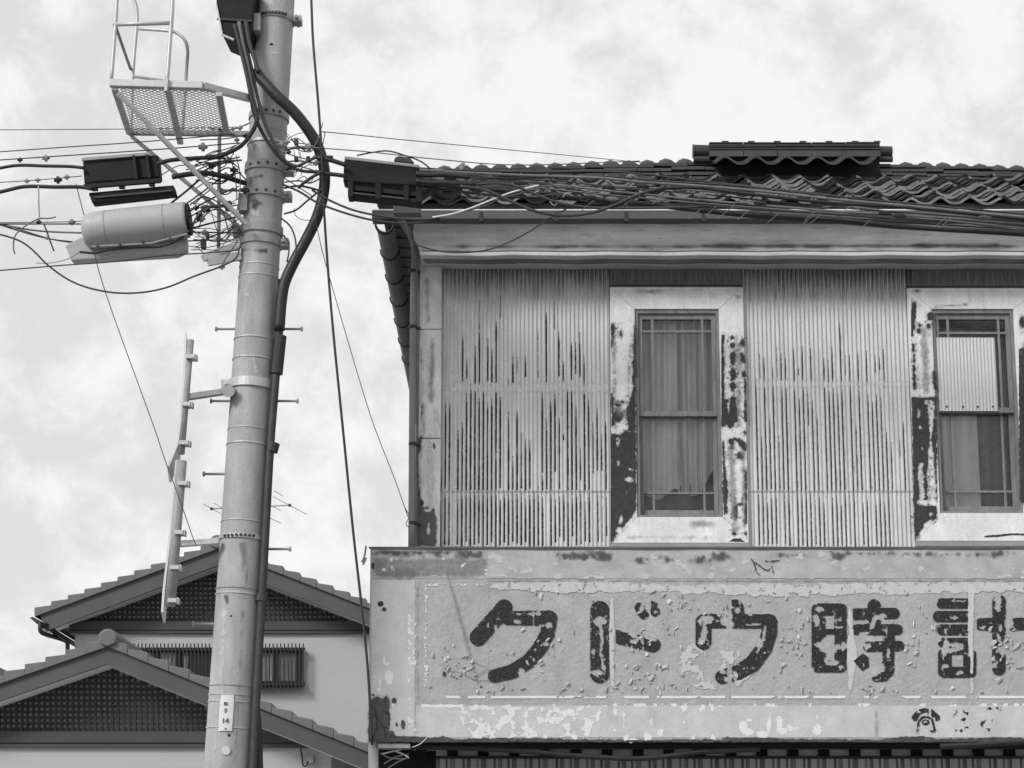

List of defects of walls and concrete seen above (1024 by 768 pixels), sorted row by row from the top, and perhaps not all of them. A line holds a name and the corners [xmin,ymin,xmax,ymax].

peeling [417,295,637,547]
peeling [721,302,938,547]